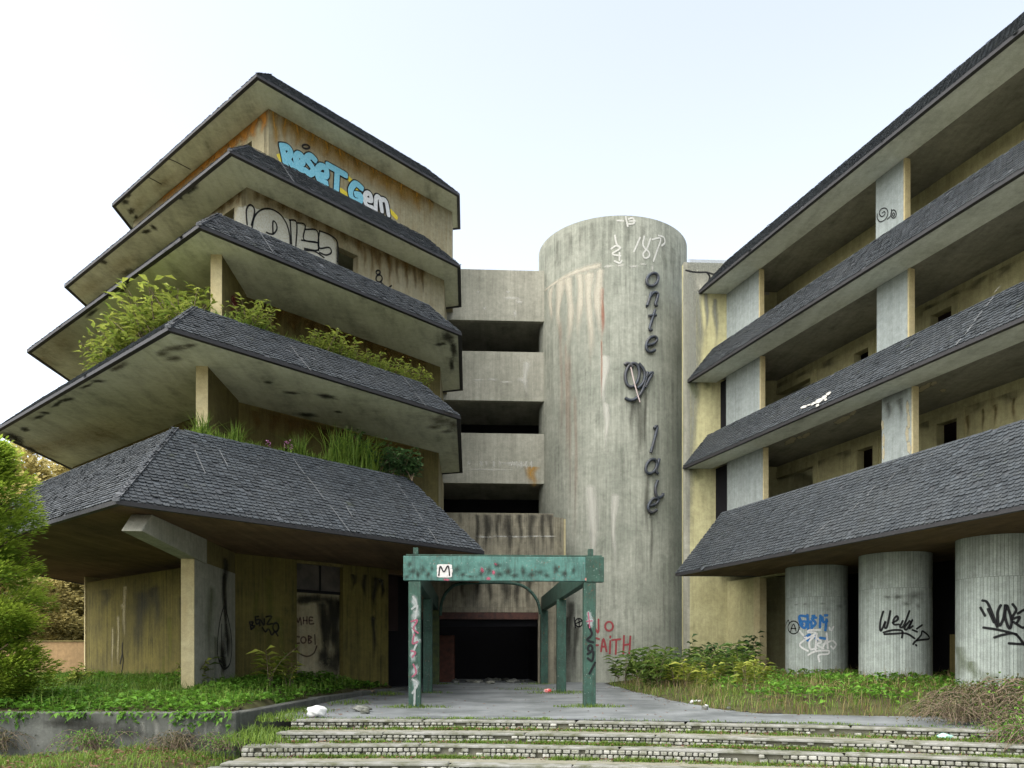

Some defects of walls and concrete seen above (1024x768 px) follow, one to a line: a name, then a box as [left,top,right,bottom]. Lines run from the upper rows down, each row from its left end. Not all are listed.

corrosion [161,111,267,199]
water stain [545,264,653,338]
water stain [6,398,72,454]
water stain [476,515,552,540]
water stain [588,487,596,548]
water stain [112,587,126,653]